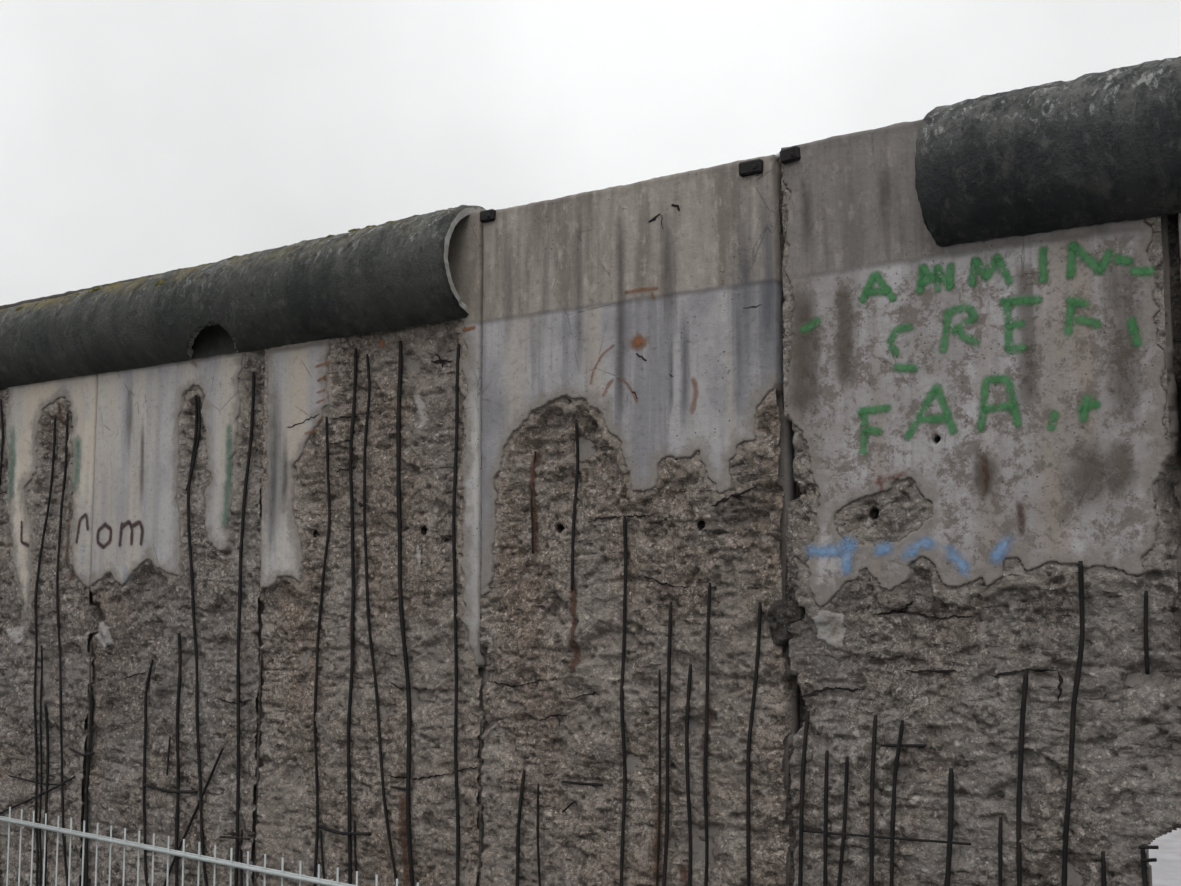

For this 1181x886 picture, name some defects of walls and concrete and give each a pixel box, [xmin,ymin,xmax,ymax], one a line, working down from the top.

spalling [0,319,795,886]
corrosion [529,453,540,554]
corrosion [569,578,580,670]
spalling [781,166,1181,886]